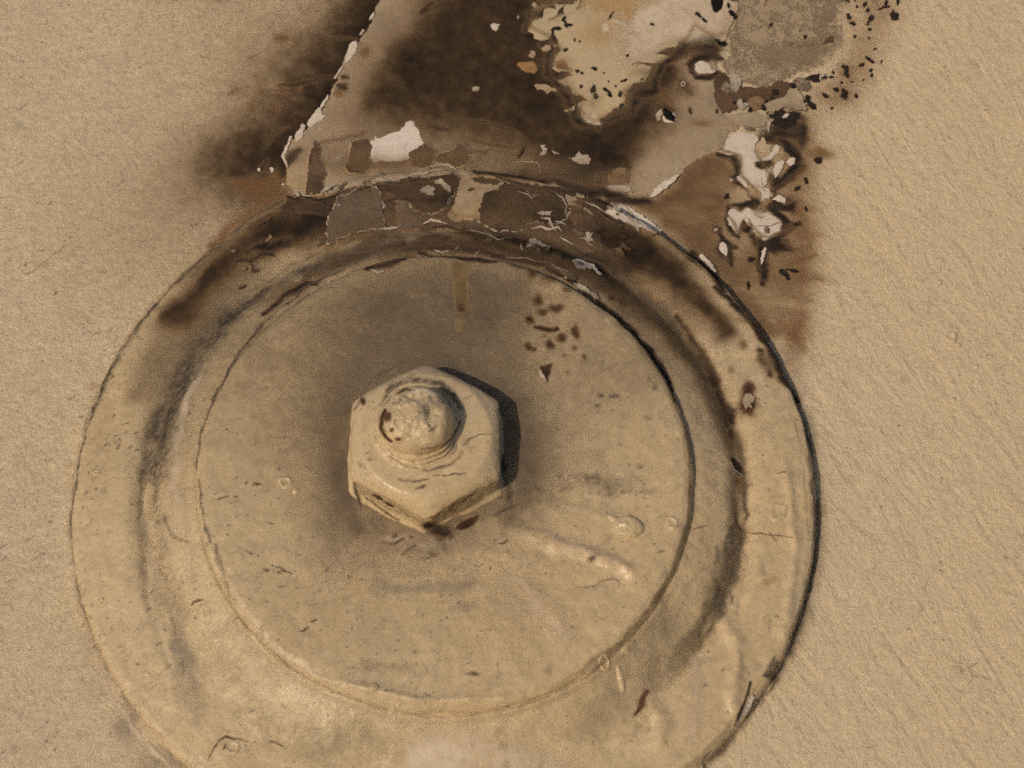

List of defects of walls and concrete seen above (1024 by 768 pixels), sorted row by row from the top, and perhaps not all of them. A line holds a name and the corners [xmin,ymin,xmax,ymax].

peeling [260,0,847,300]
corrosion [524,294,586,359]